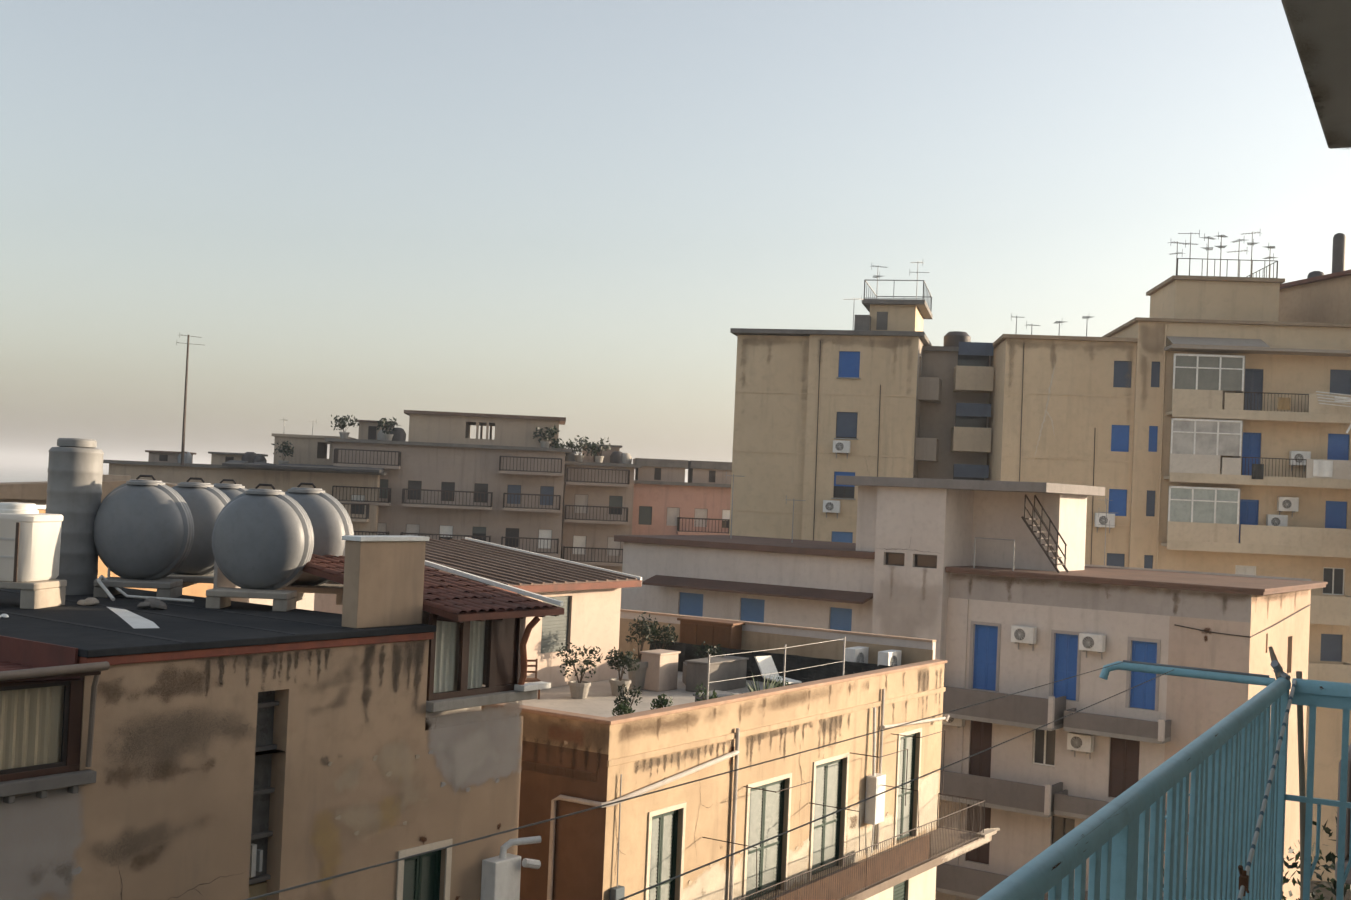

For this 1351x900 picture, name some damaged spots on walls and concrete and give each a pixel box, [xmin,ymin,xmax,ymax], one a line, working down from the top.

water stain [1286,0,1351,150]
water stain [97,640,427,791]
water stain [520,679,869,783]
water stain [886,667,943,727]